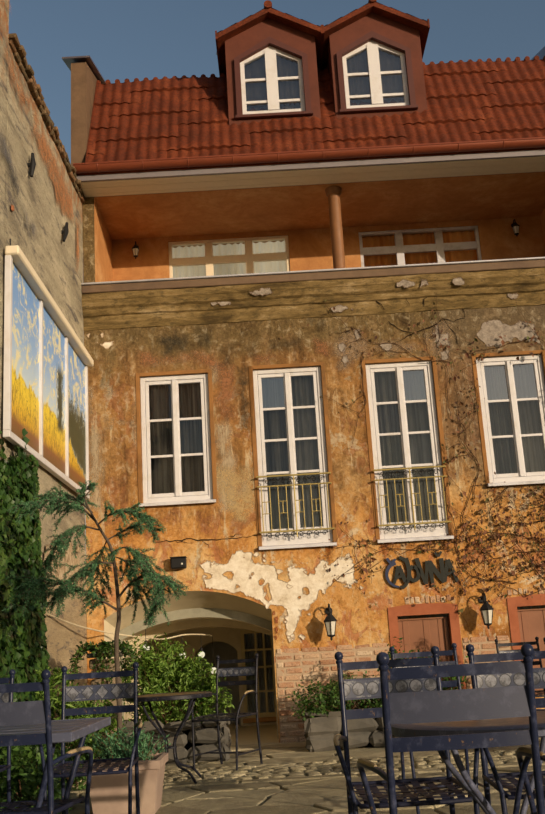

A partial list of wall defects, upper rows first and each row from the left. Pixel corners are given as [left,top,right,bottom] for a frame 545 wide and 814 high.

peeling [396,279,429,288]
peeling [249,288,272,296]
flaking render [476,319,543,347]
crack [157,534,257,546]
flaking render [199,550,390,743]